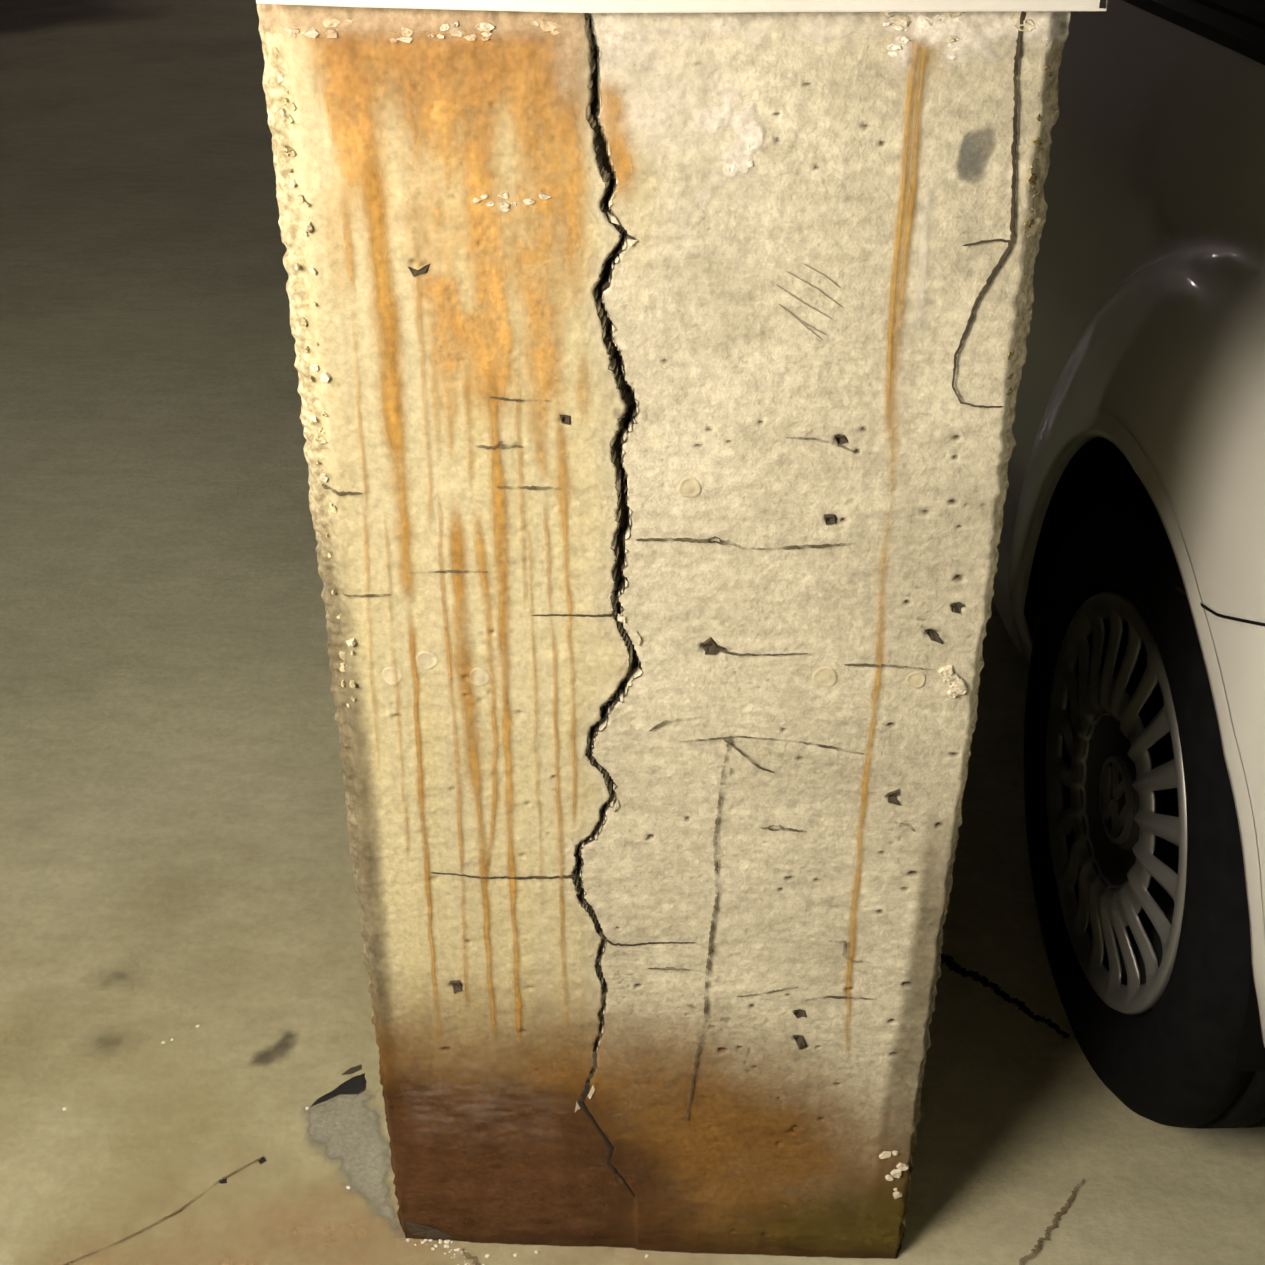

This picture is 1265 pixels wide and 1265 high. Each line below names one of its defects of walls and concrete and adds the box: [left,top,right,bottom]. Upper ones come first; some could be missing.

corrosion [887,35,927,416]
crack [952,11,1026,408]
corrosion [313,26,913,1259]
crack [431,13,870,1197]
crack [63,1202,190,1265]
crack [217,1157,261,1183]
spalling [342,1064,362,1075]
crack [941,954,1070,1038]